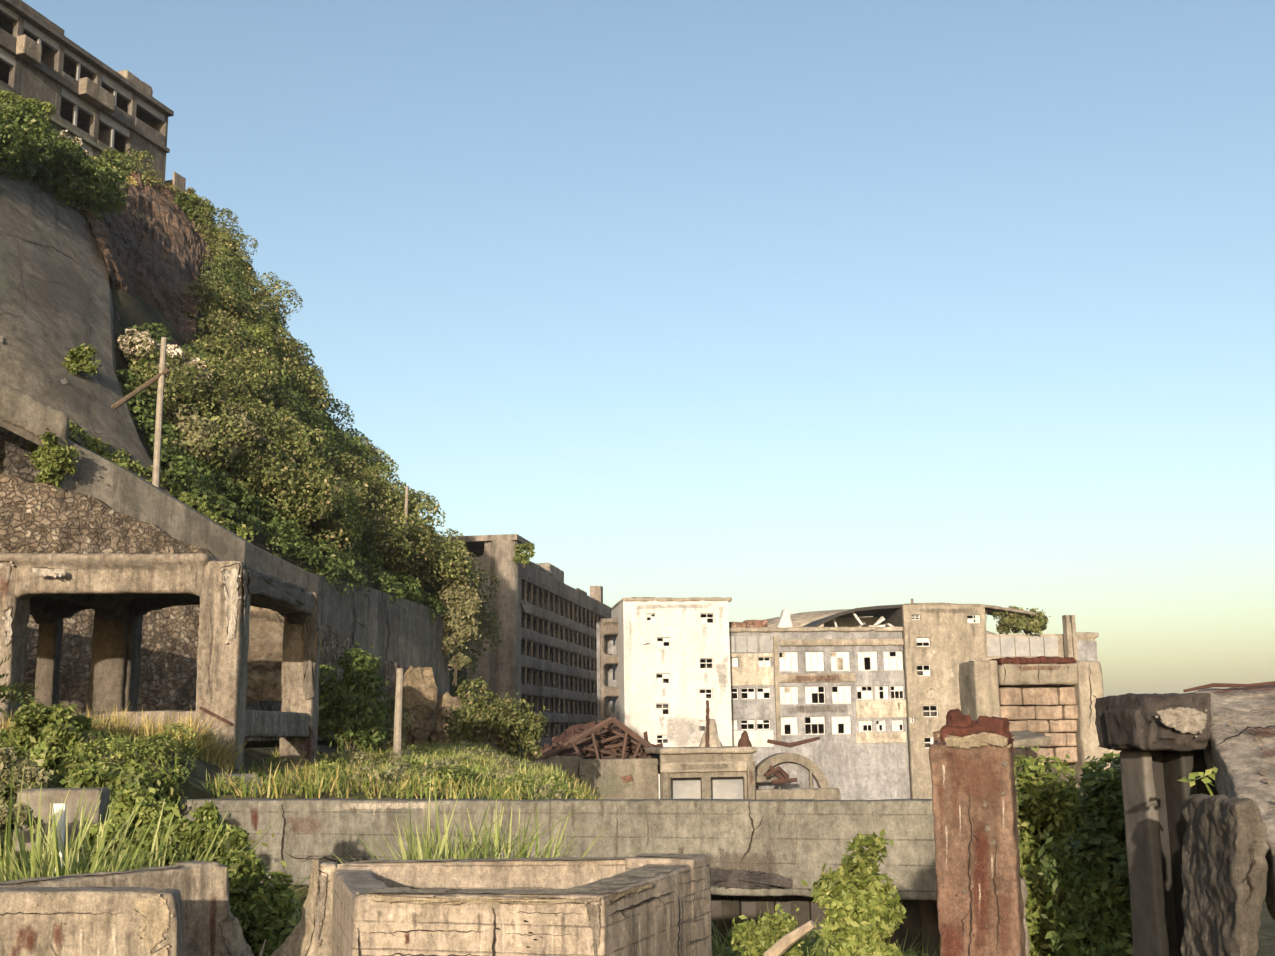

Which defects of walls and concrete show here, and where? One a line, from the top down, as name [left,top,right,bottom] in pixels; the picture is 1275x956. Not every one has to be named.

crack [740,801,764,867]
rust [12,927,35,956]
spalling [122,888,173,956]
spalling [220,917,254,956]
spalling [271,859,328,956]
rust [942,837,988,956]